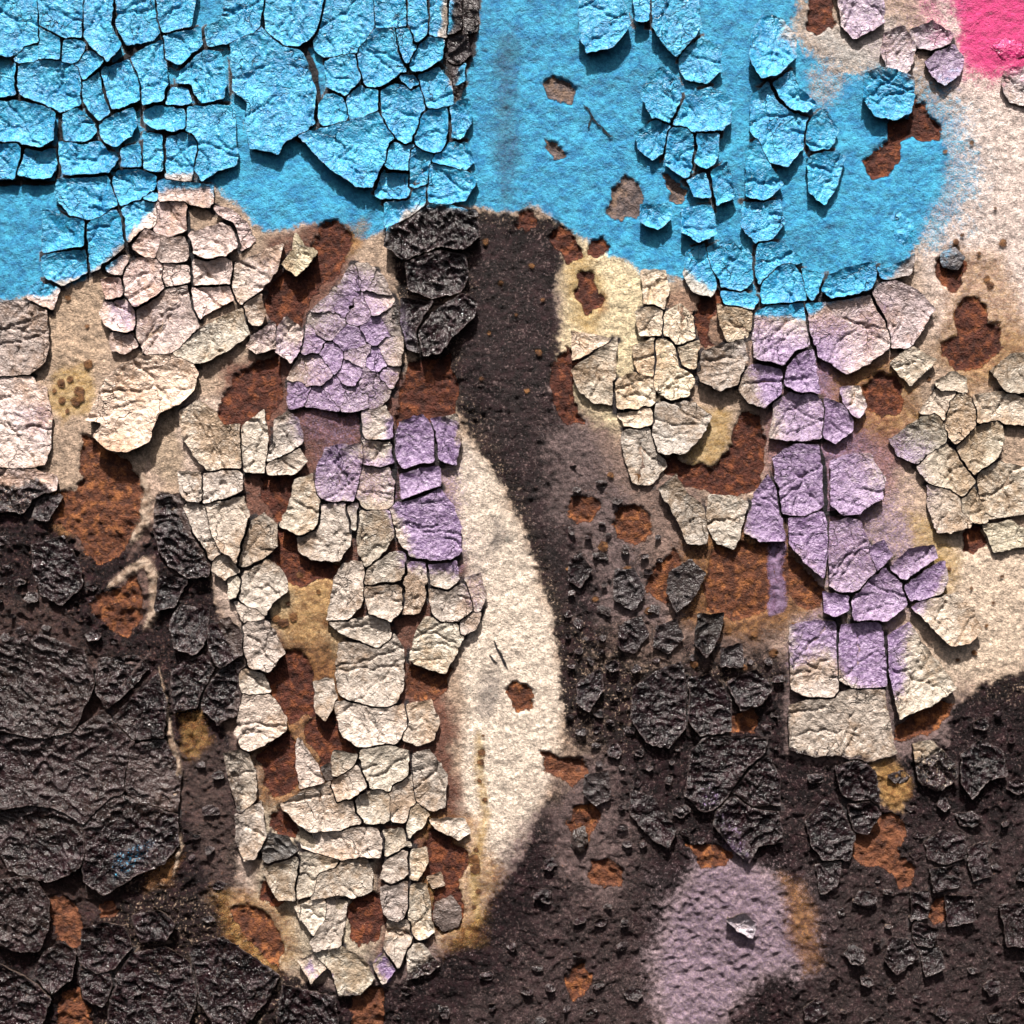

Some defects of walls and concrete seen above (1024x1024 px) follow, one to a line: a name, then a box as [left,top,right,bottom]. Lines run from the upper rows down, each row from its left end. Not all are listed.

peeling [862,67,915,120]
peeling [298,112,394,188]
rust [862,99,948,180]
peeling [282,233,318,276]
rust [264,220,354,327]
rust [935,258,1004,372]
peeling [85,308,250,452]
rust [218,354,283,430]
rust [51,434,158,638]
crack [0,0,508,1024]
peeling [911,592,982,646]
peeling [911,739,1008,799]